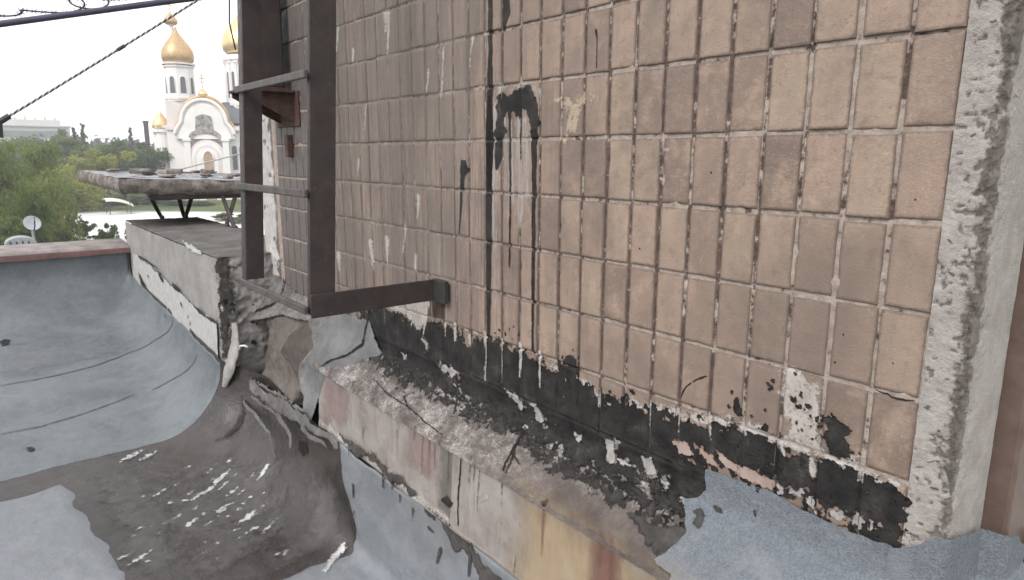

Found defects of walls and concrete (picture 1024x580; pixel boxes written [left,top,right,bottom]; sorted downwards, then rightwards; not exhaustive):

spalling [214,258,241,364]
crack [321,311,369,367]
leakage [360,0,915,557]
crack [374,380,442,435]
crack [681,376,707,397]
spalling [766,366,824,451]
peeling [143,460,274,533]
peeling [319,421,453,523]
crack [502,429,524,471]
peeling [322,542,345,572]